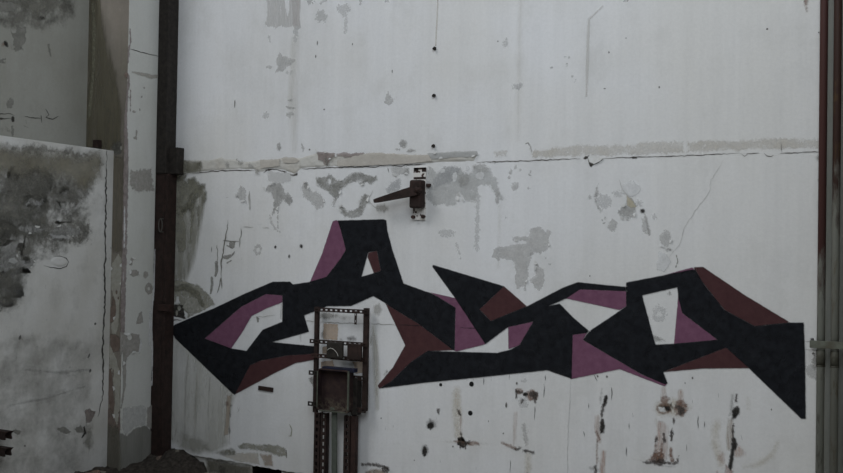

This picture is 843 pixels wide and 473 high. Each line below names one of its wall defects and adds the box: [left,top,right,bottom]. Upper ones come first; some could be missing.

peeling [267,0,327,42]
damp [0,0,123,308]
peeling [108,29,155,424]
flaking render [309,149,364,165]
flaking render [302,173,376,217]
peeling [427,151,502,205]
crack [477,156,576,164]
crack [603,147,816,258]
peeling [493,227,550,290]
rust [657,397,687,423]